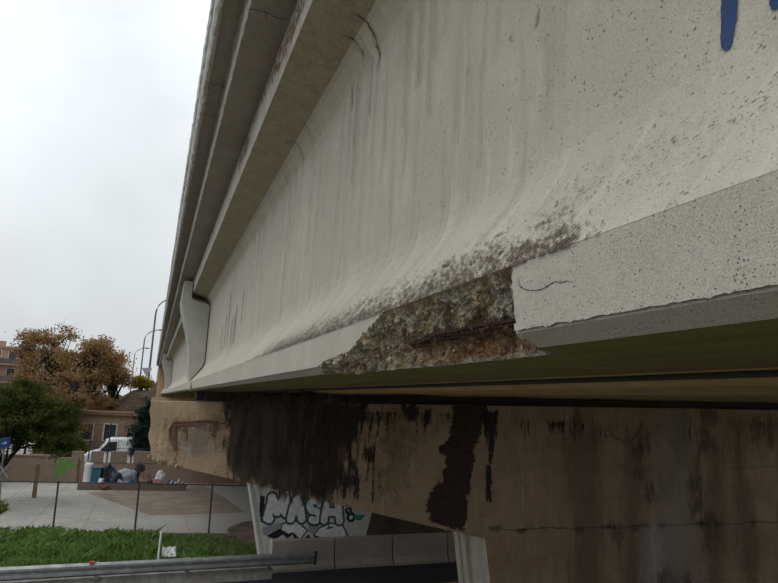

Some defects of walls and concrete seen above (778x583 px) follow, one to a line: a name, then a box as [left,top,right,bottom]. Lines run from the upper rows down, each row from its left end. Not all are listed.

crack [345,14,380,69]
leakage [247,72,778,359]
spalling [320,267,553,375]
crack [517,277,574,291]
leakage [219,389,498,531]